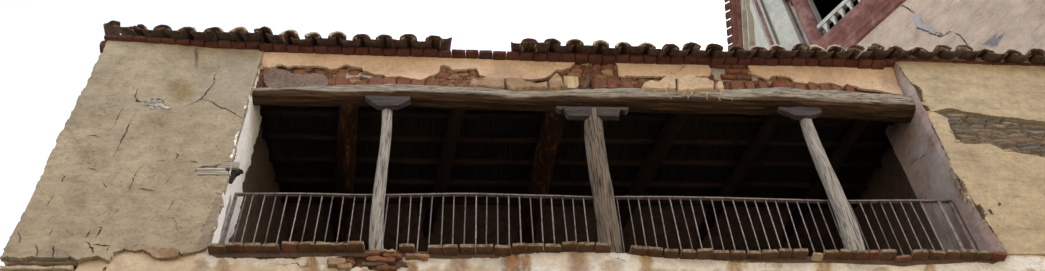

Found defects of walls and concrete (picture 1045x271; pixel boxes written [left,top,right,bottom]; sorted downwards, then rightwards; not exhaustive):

crack [901,5,968,46]
crack [180,70,245,120]
peeling [263,68,350,88]
peeling [368,68,568,92]
peeling [580,62,855,101]